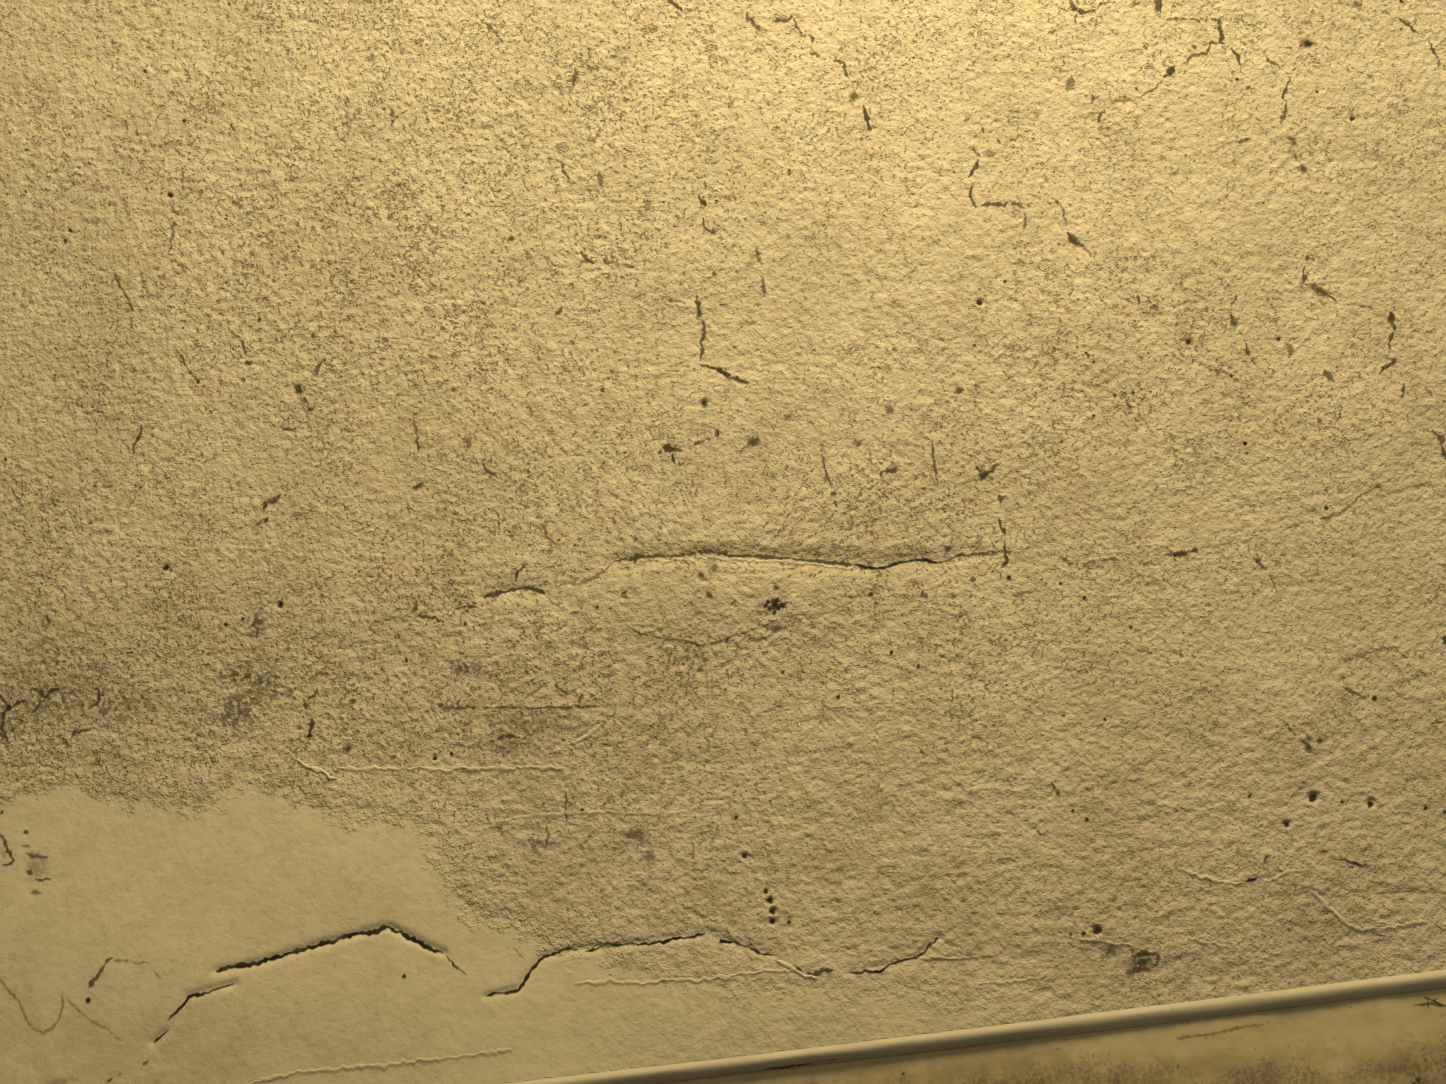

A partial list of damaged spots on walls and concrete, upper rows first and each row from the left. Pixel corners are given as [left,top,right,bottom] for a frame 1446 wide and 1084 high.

crack [374,494,1012,646]
crack [86,957,113,1003]
crack [107,925,999,1082]